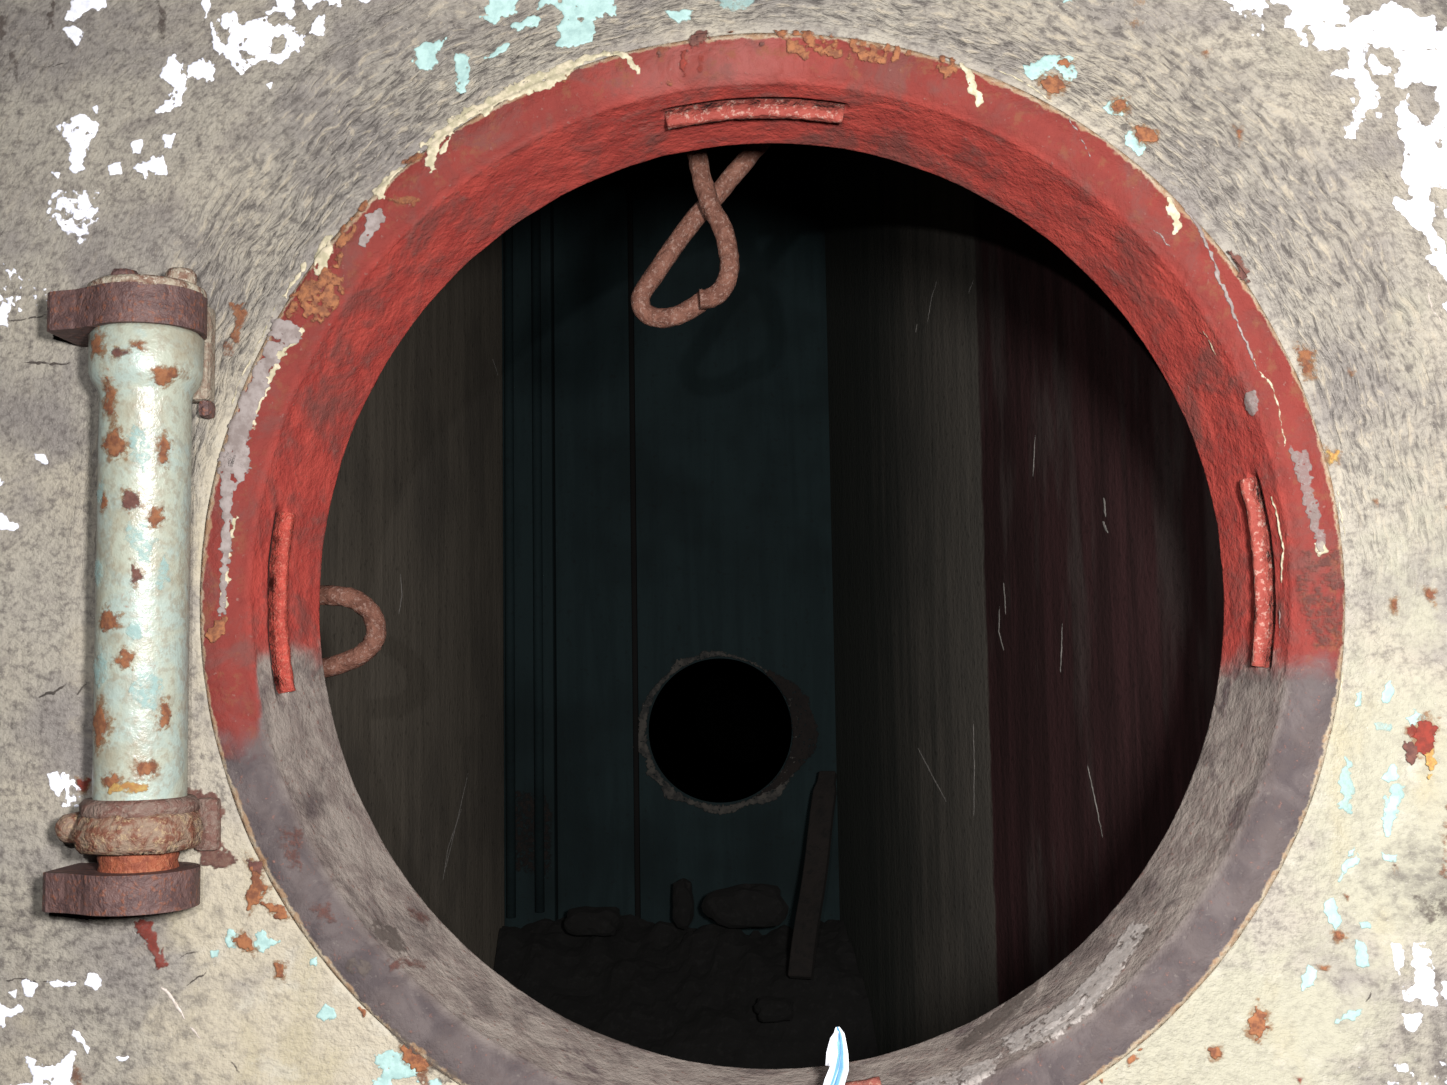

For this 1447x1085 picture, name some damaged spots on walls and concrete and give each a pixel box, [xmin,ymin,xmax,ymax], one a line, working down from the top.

peeling [62,0,107,46]
peeling [155,0,342,113]
peeling [411,0,640,173]
peeling [46,105,99,244]
peeling [1226,0,1447,281]
rust [101,376,131,463]
rust [151,366,184,389]
peeling [205,235,333,643]
rust [101,488,165,528]
rust [77,759,159,795]
rust [1403,711,1439,780]
rust [198,841,291,919]